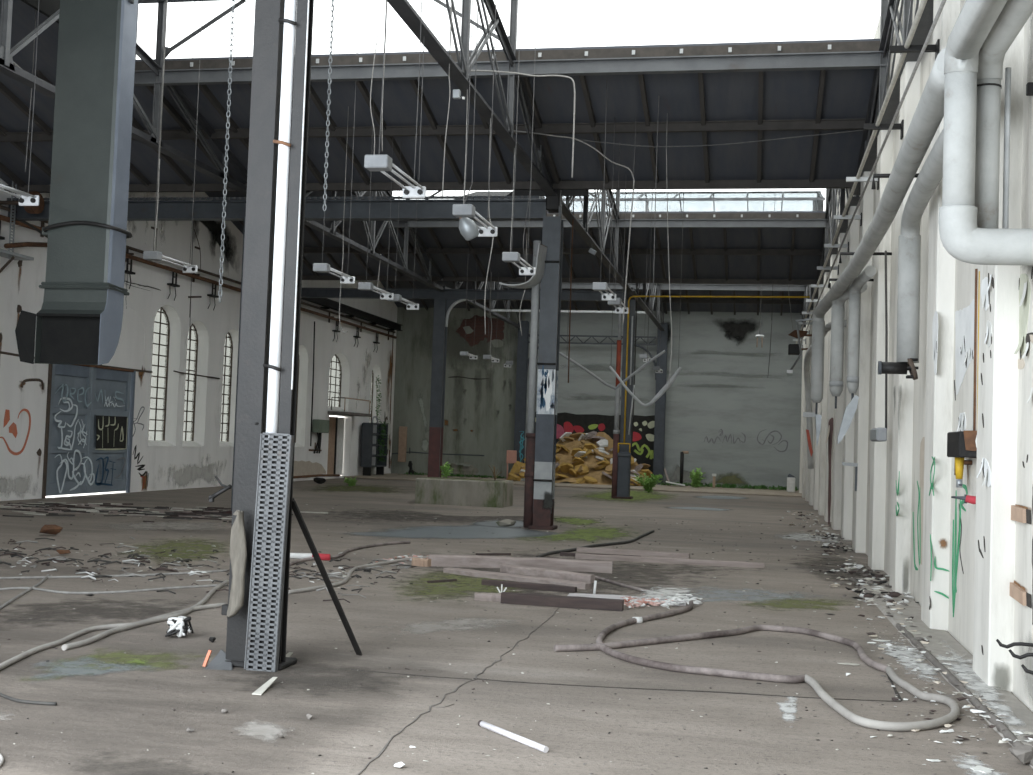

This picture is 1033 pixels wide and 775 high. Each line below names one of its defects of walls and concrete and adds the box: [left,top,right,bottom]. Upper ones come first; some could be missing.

flaking render [456,315,505,348]
peeling [1014,267,1033,369]
damp [332,510,524,522]
crack [350,607,902,775]